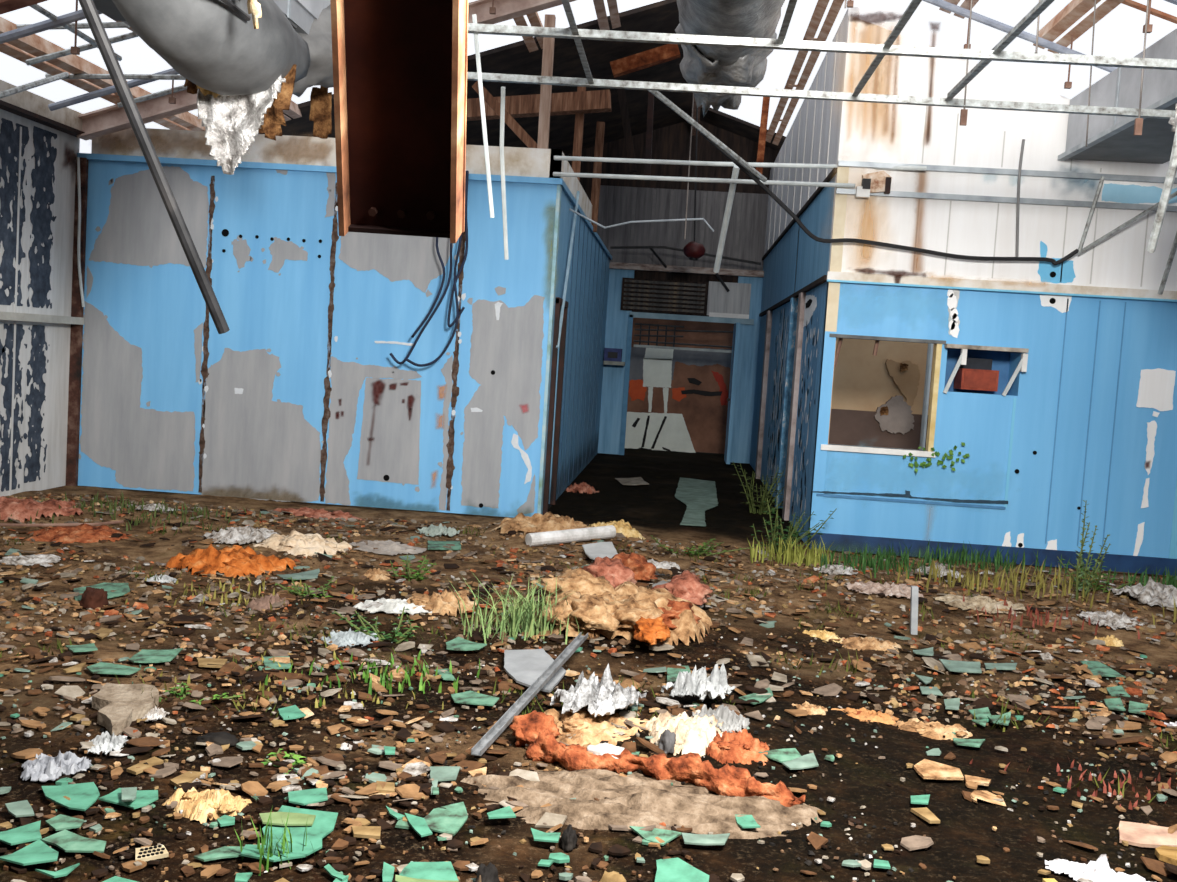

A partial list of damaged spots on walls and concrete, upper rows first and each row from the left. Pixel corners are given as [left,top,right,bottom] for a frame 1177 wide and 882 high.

peeling [0,118,57,309]
peeling [1102,183,1177,204]
peeling [0,323,49,492]
peeling [79,166,545,514]
peeling [1136,368,1176,508]
peeling [1133,522,1145,556]